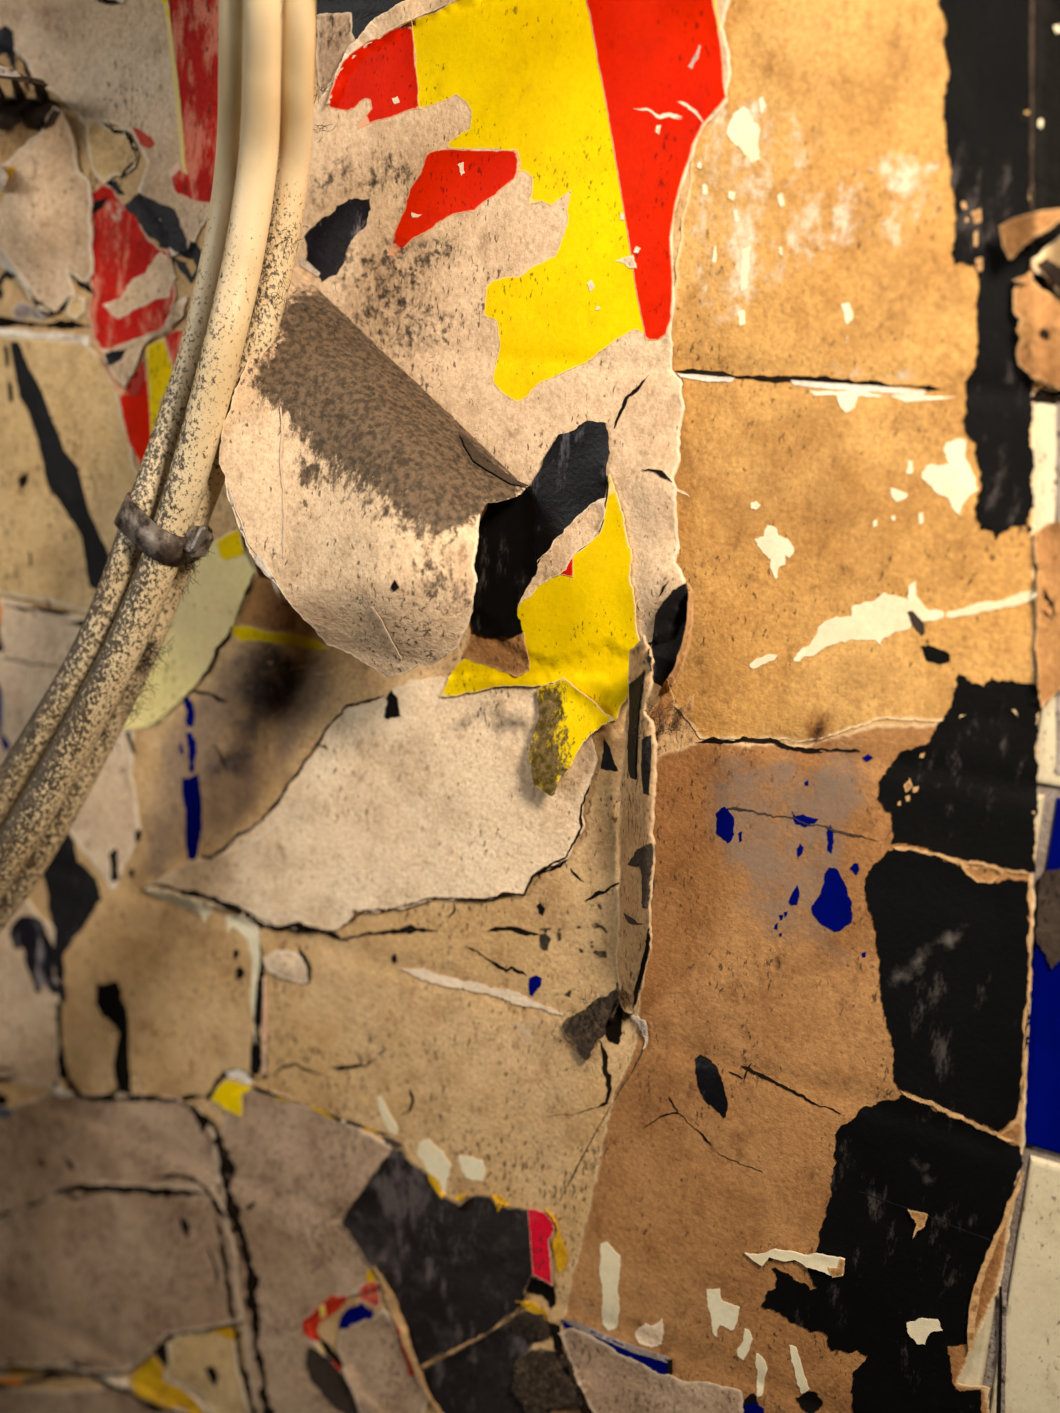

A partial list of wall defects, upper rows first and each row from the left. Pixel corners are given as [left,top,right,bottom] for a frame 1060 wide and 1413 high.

peeling [898,778,919,805]
crack [142,696,642,984]
peeling [1035,869,1060,969]
crack [0,1067,19,1082]
peeling [907,1209,928,1237]
crack [0,1082,275,1413]
peeling [907,1318,943,1344]